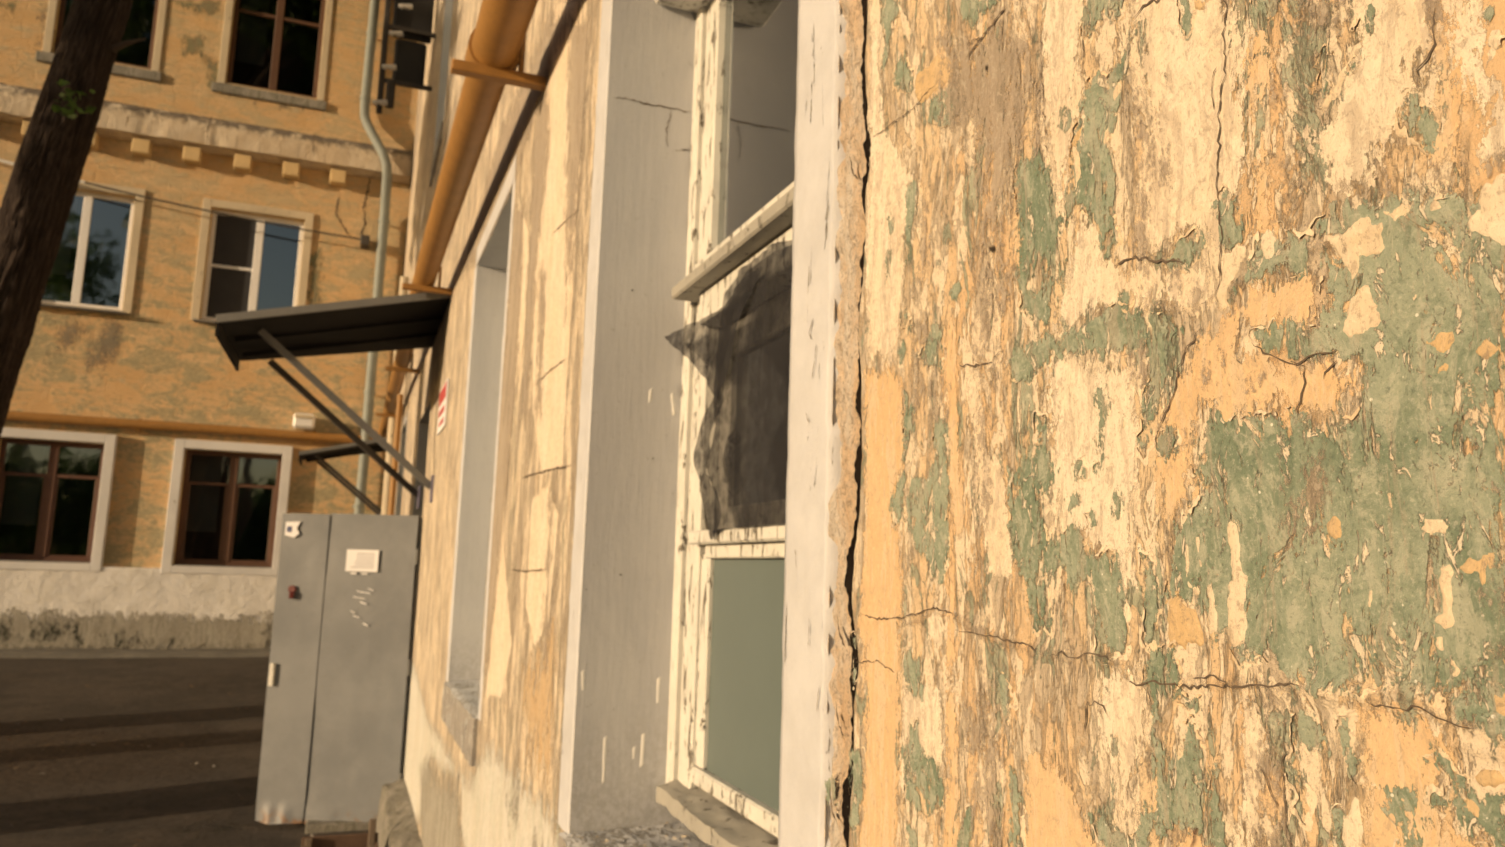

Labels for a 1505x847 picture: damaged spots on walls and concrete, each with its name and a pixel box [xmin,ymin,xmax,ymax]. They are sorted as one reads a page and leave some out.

leakage [0,620,83,645]
peeling [486,0,587,701]
crack [612,97,691,151]
crack [850,0,937,310]
flaking render [825,0,988,847]
crack [808,358,1304,847]
peeling [960,0,1505,847]
crack [1367,702,1473,729]